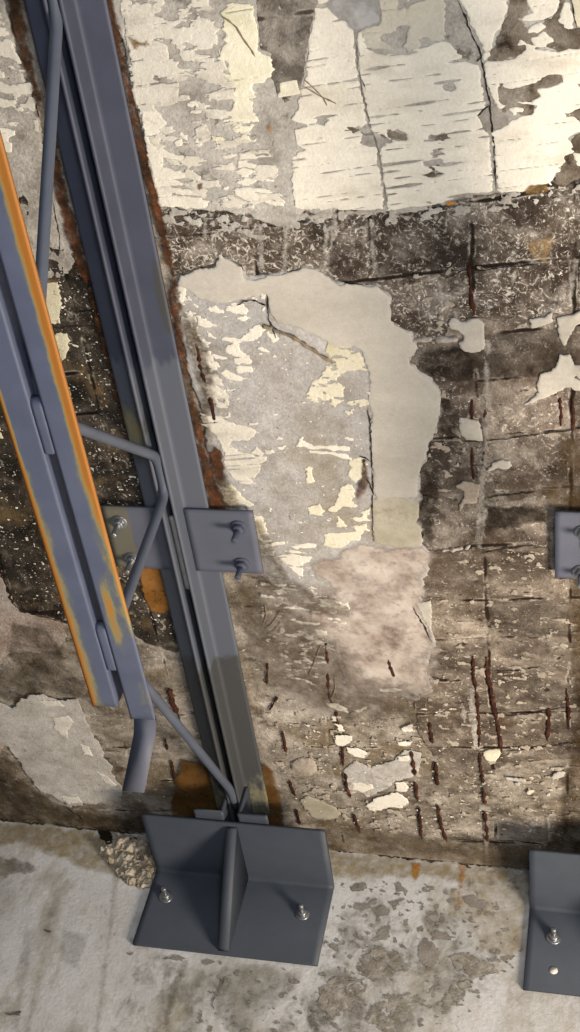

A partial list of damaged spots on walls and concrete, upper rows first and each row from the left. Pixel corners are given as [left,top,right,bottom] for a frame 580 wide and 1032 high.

crack [353,29,388,202]
crack [457,0,496,178]
corrosion [53,141,128,436]
corrosion [107,0,227,509]
spalling [0,405,67,624]
spalling [47,247,179,652]
spalling [120,0,580,844]
corrosion [357,459,369,498]
peeling [39,700,74,738]
peeling [61,796,82,804]
corrosion [171,760,217,818]
corrosion [262,765,283,826]